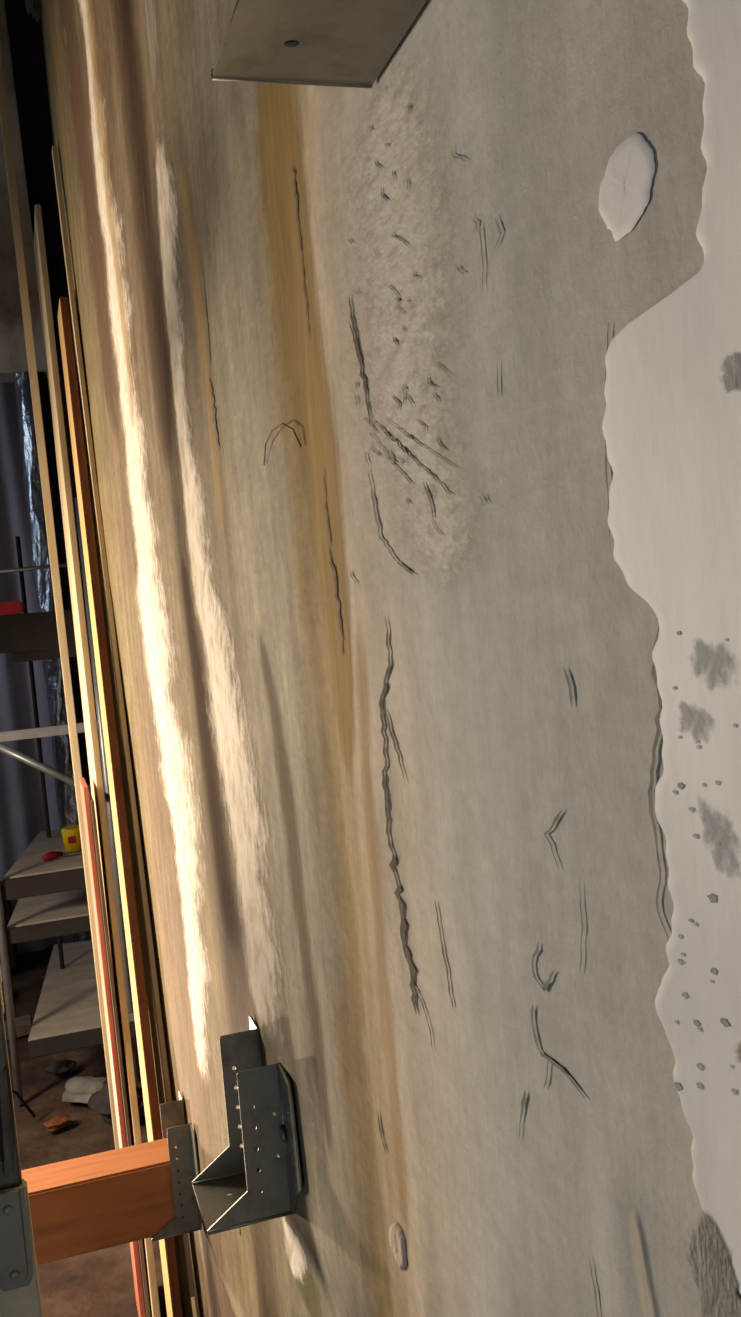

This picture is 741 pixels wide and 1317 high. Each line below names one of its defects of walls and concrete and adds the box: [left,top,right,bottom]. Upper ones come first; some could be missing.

peeling [599,133,655,241]
peeling [723,354,741,392]
spalling [675,1063,704,1103]
peeling [389,1222,407,1270]
spalling [687,1214,741,1317]